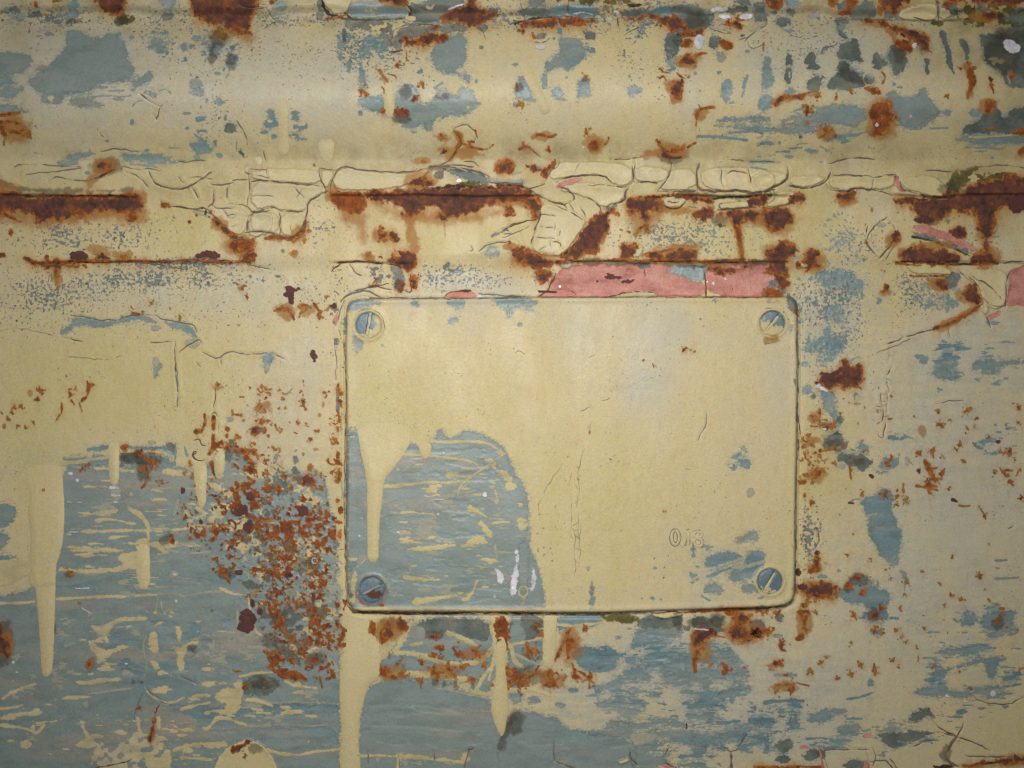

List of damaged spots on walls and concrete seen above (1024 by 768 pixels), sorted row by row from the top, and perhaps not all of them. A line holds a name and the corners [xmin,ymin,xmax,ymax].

peeling [0,0,240,113]
peeling [316,0,481,133]
peeling [511,0,688,109]
rust [0,160,146,235]
rust [326,124,557,293]
crack [126,152,1024,258]
peeling [446,204,865,367]
rust [555,188,823,290]
rust [893,172,1024,269]
rust [168,380,494,697]
peeling [0,423,1024,768]
rust [682,551,840,699]